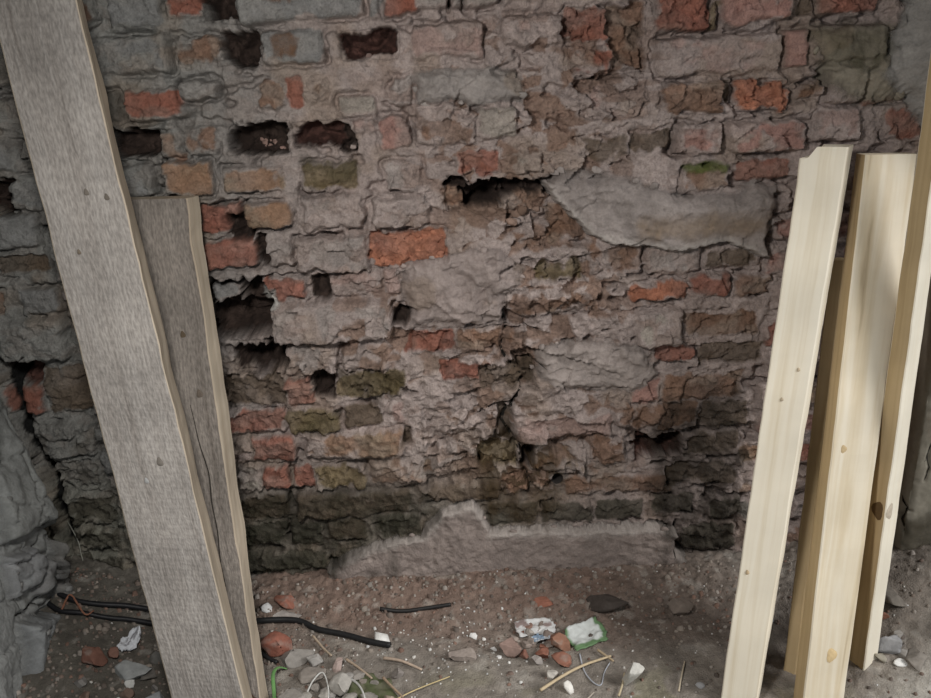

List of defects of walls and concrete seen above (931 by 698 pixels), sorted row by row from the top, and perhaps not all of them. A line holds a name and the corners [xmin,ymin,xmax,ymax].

spalling [202,0,264,67]
spalling [340,29,400,61]
spalling [564,6,649,121]
spalling [115,128,167,179]
spalling [227,119,358,157]
spalling [200,200,248,233]
flaking render [443,166,779,258]
spalling [209,275,341,408]
spalling [411,255,601,390]
spalling [421,403,554,494]
damp [648,402,740,551]
flaking render [327,499,687,580]